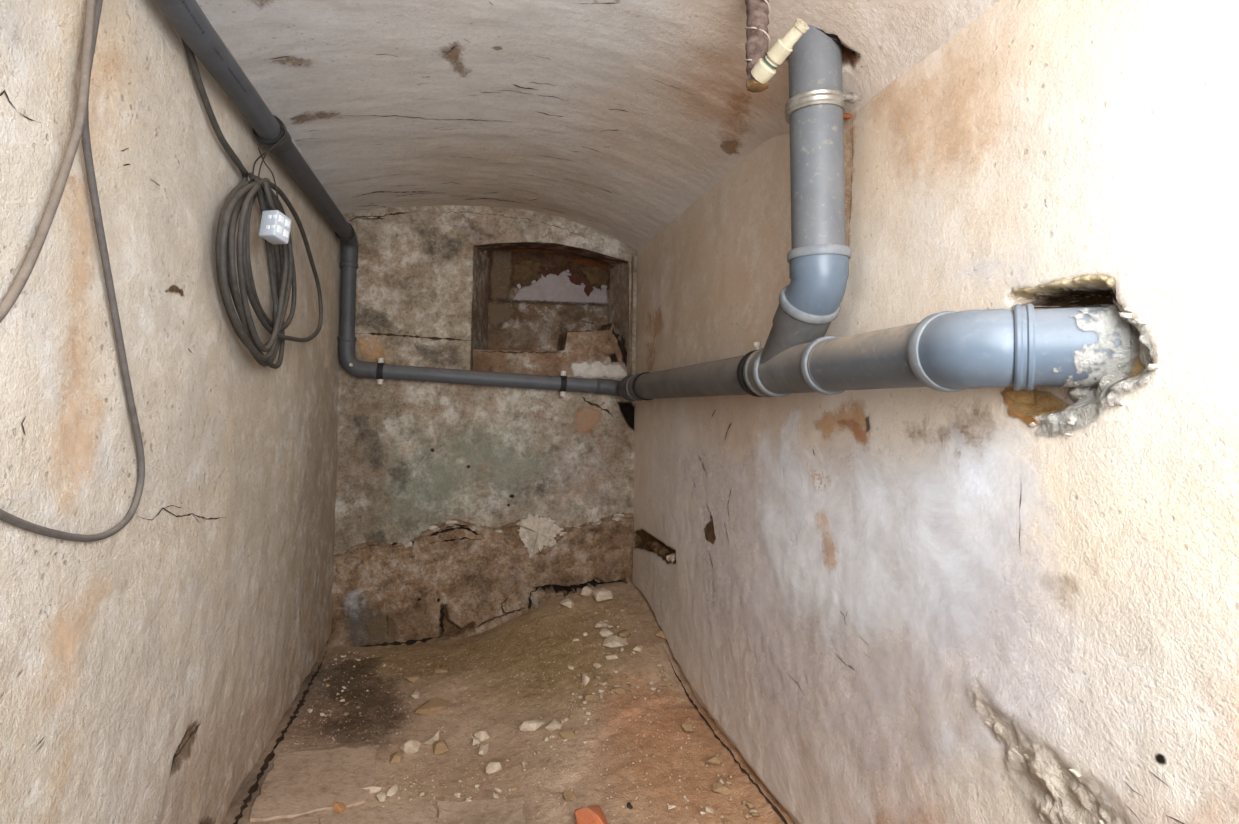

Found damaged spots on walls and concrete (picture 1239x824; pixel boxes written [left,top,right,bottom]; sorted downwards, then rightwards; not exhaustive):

spalling [487,249,614,305]
spalling [571,352,627,378]
spalling [1002,275,1159,436]
crack [141,505,224,522]
spalling [327,513,676,647]
spalling [971,688,1126,824]